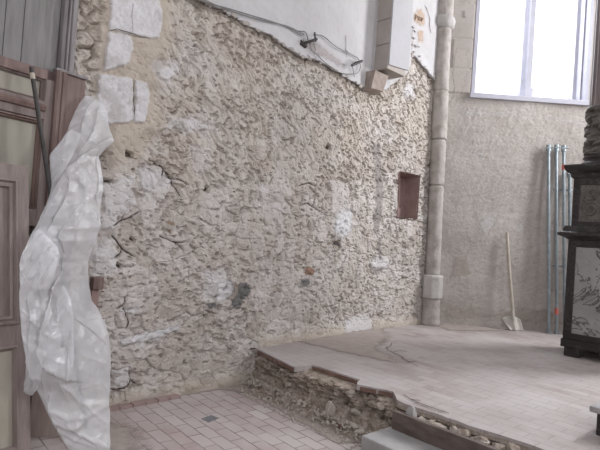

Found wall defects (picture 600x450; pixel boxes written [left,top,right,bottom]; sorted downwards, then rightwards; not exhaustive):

spalling [186,0,363,89]
spalling [411,26,436,84]
crack [149,160,187,196]
crack [112,212,138,258]